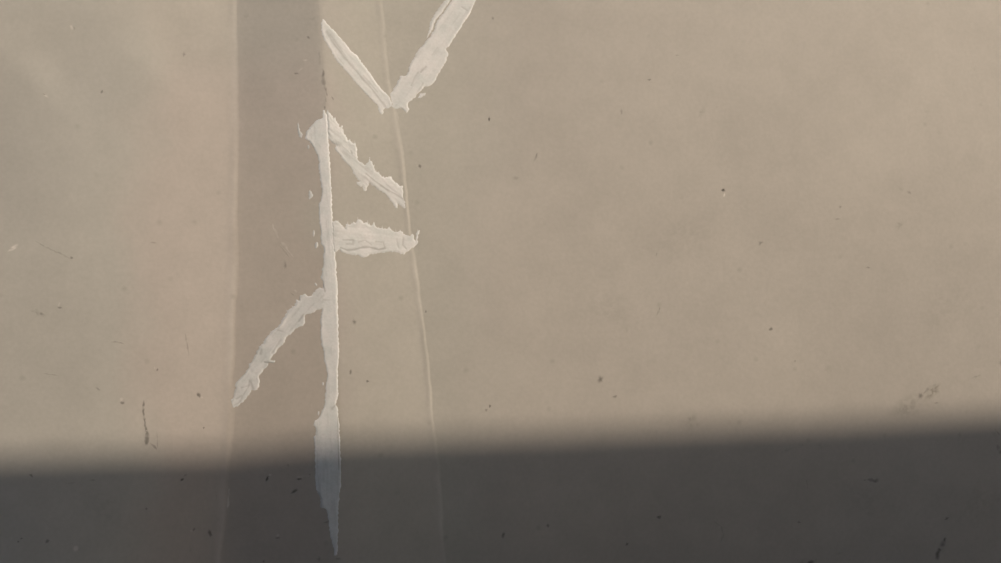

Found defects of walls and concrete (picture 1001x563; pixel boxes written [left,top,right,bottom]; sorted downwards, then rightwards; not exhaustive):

peeling [321,0,476,114]
peeling [231,96,420,556]